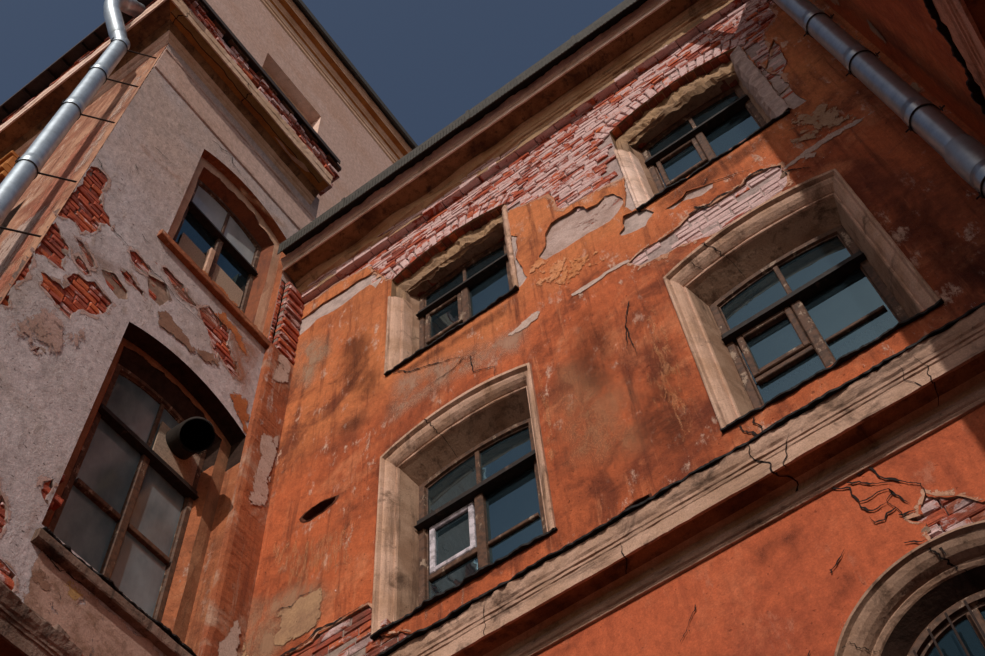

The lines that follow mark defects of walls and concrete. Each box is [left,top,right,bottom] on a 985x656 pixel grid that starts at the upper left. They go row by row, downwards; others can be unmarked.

flaking render [0,69,240,381]
flaking render [268,0,874,383]
flaking render [0,476,12,539]
flaking render [36,474,66,511]
flaking render [249,434,279,506]
spalling [299,495,339,523]
crack [739,417,799,492]
crack [831,467,981,590]
flaking render [903,488,985,540]
flaking render [0,551,164,656]
flaking render [218,620,253,656]
flaking render [274,588,411,656]